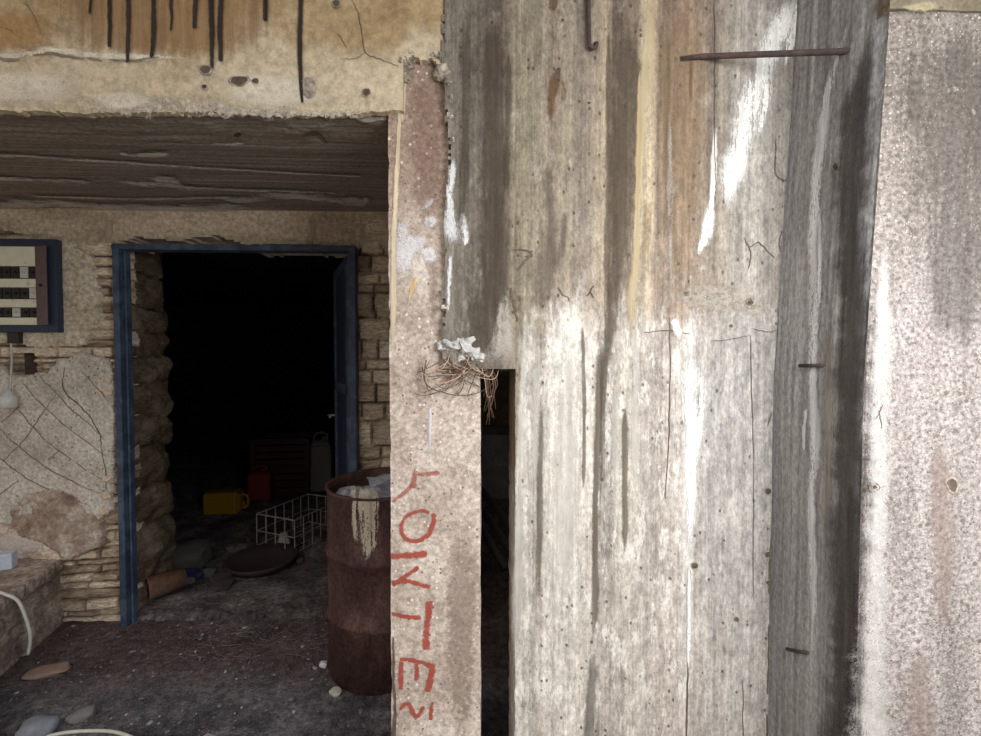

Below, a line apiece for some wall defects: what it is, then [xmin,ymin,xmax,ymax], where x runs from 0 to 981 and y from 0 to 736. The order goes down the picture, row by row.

leakage [78,0,263,51]
leakage [395,35,470,310]
leakage [469,36,511,350]
leakage [698,0,797,255]
peeling [0,523,44,555]
crack [62,367,107,476]
leakage [536,401,544,585]
leakage [581,9,654,631]
leakage [671,319,682,337]
leakage [680,355,706,542]
leakage [802,27,892,736]
leakage [584,663,597,736]